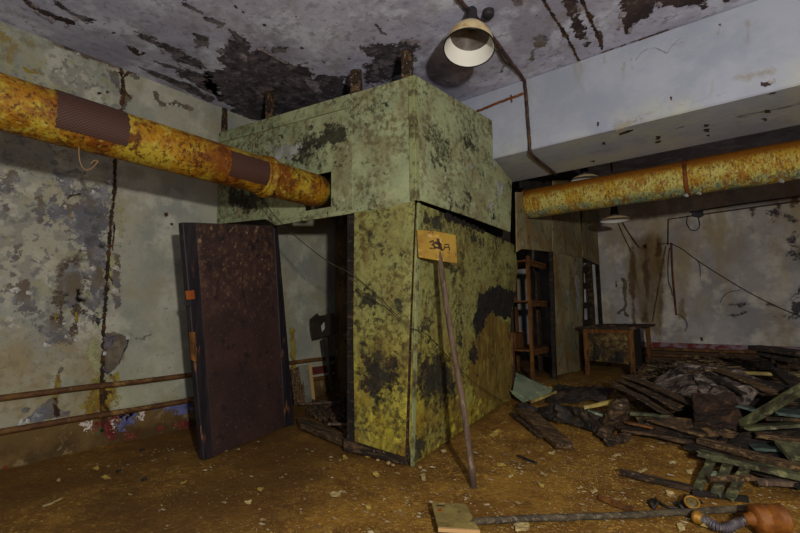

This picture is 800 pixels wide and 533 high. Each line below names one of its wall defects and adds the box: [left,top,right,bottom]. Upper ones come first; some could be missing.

peeling [562,0,604,50]
peeling [618,0,708,35]
peeling [52,2,350,121]
peeling [0,164,21,213]
peeling [31,171,127,327]
peeling [0,243,78,353]
spalling [102,331,130,374]